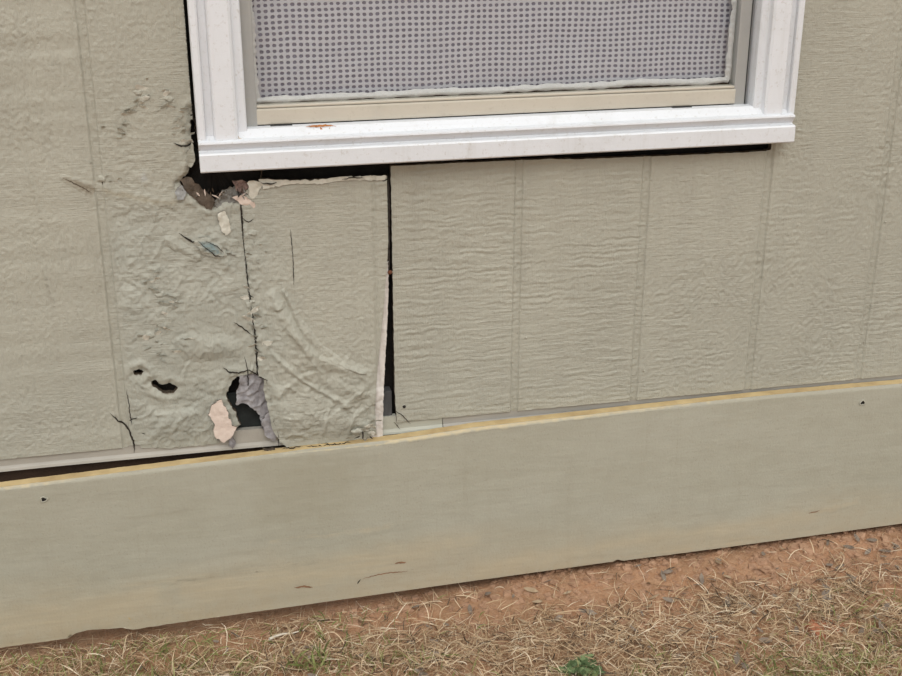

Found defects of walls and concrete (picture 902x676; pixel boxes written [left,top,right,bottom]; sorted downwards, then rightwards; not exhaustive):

peeling [116,78,386,236]
crack [224,204,266,386]
peeling [240,285,273,361]
peeling [208,399,237,443]